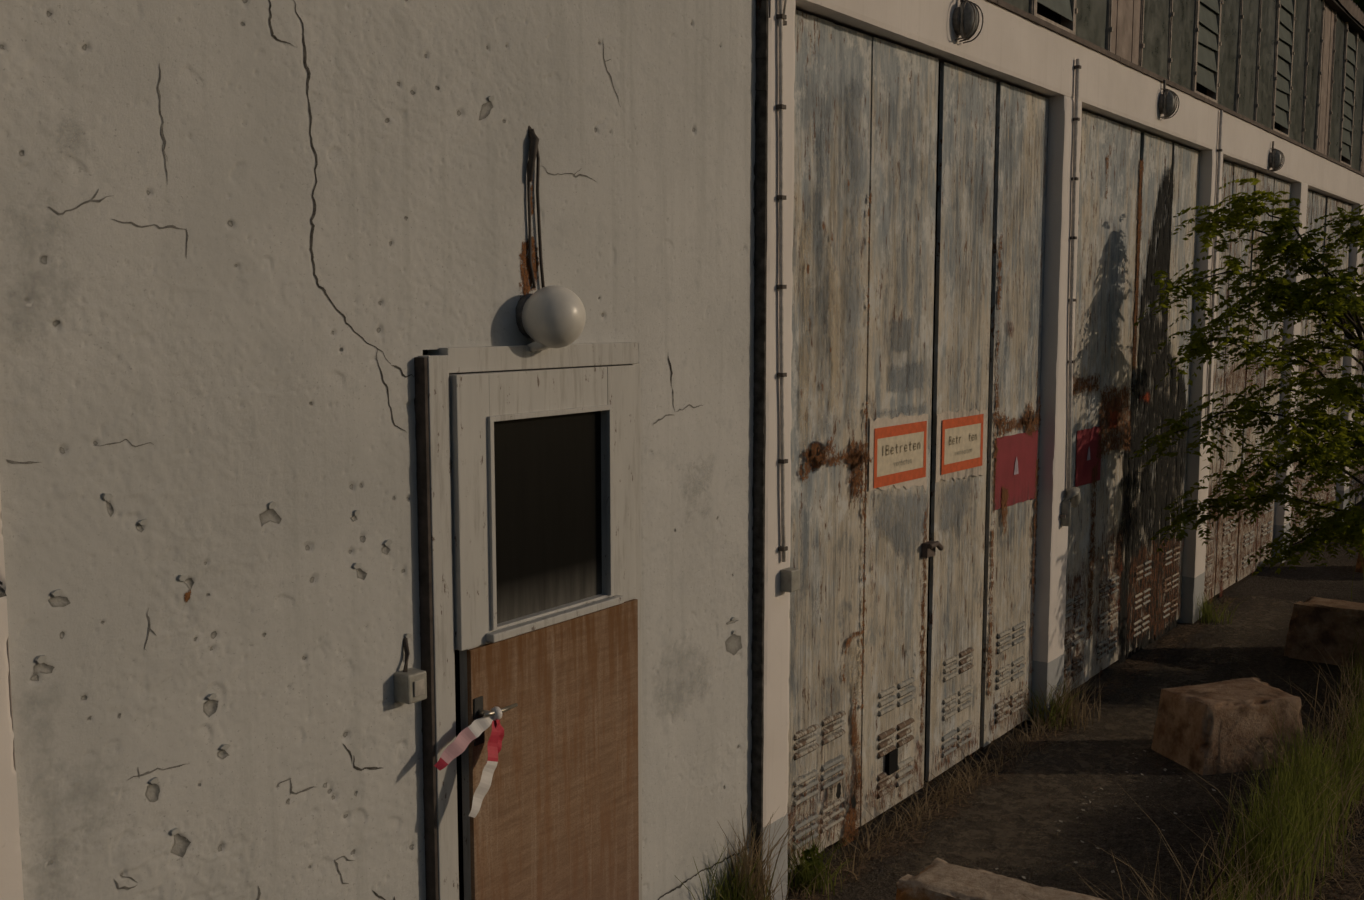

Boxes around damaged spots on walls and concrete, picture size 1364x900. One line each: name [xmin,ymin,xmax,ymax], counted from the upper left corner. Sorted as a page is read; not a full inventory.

crack [157,64,168,185]
crack [48,189,188,259]
crack [269,0,414,433]
corrosion [519,179,540,299]
crack [653,356,703,424]
corrosion [788,235,1041,860]
corrosion [1064,160,1182,691]
corrosion [1204,349,1281,603]
corrosion [1290,442,1364,540]
crack [276,778,314,795]
crack [343,744,381,771]
crack [334,856,395,900]